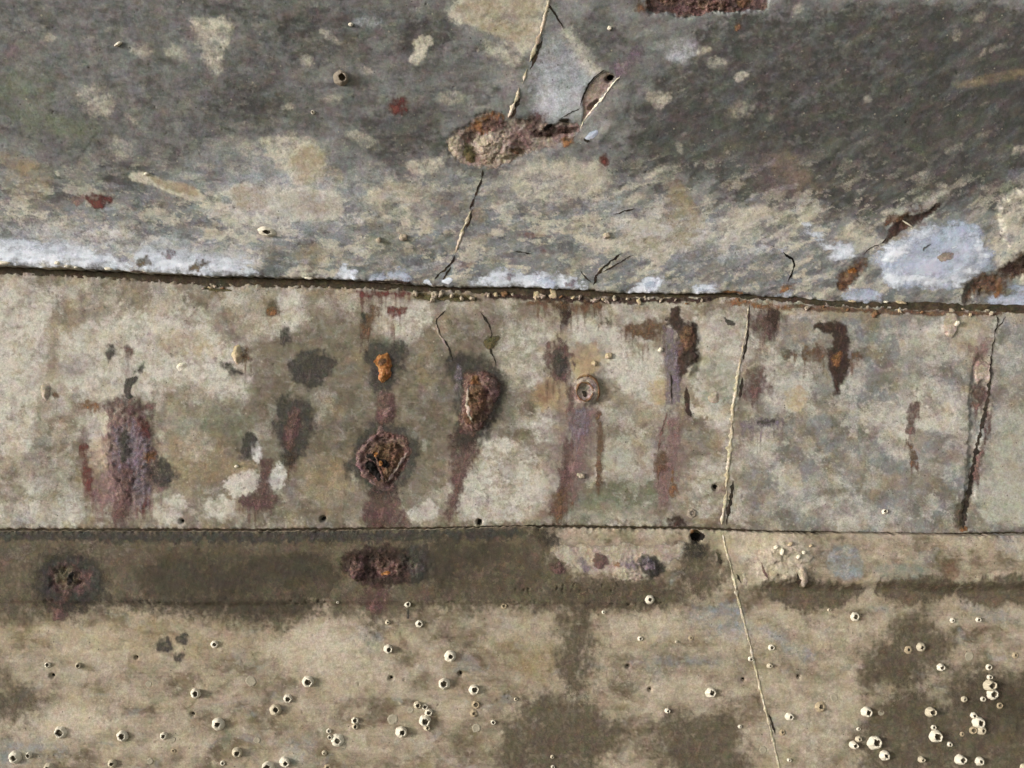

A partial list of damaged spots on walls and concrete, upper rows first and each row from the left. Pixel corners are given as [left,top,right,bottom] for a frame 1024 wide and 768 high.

crack [508,0,563,119]
spalling [446,70,620,170]
crack [435,170,484,280]
efflorescence [842,220,995,304]
rust [374,353,392,383]
rust [621,306,699,502]
rust [783,321,862,395]
crack [954,314,1006,532]
damp [0,349,731,768]
crack [716,305,780,768]